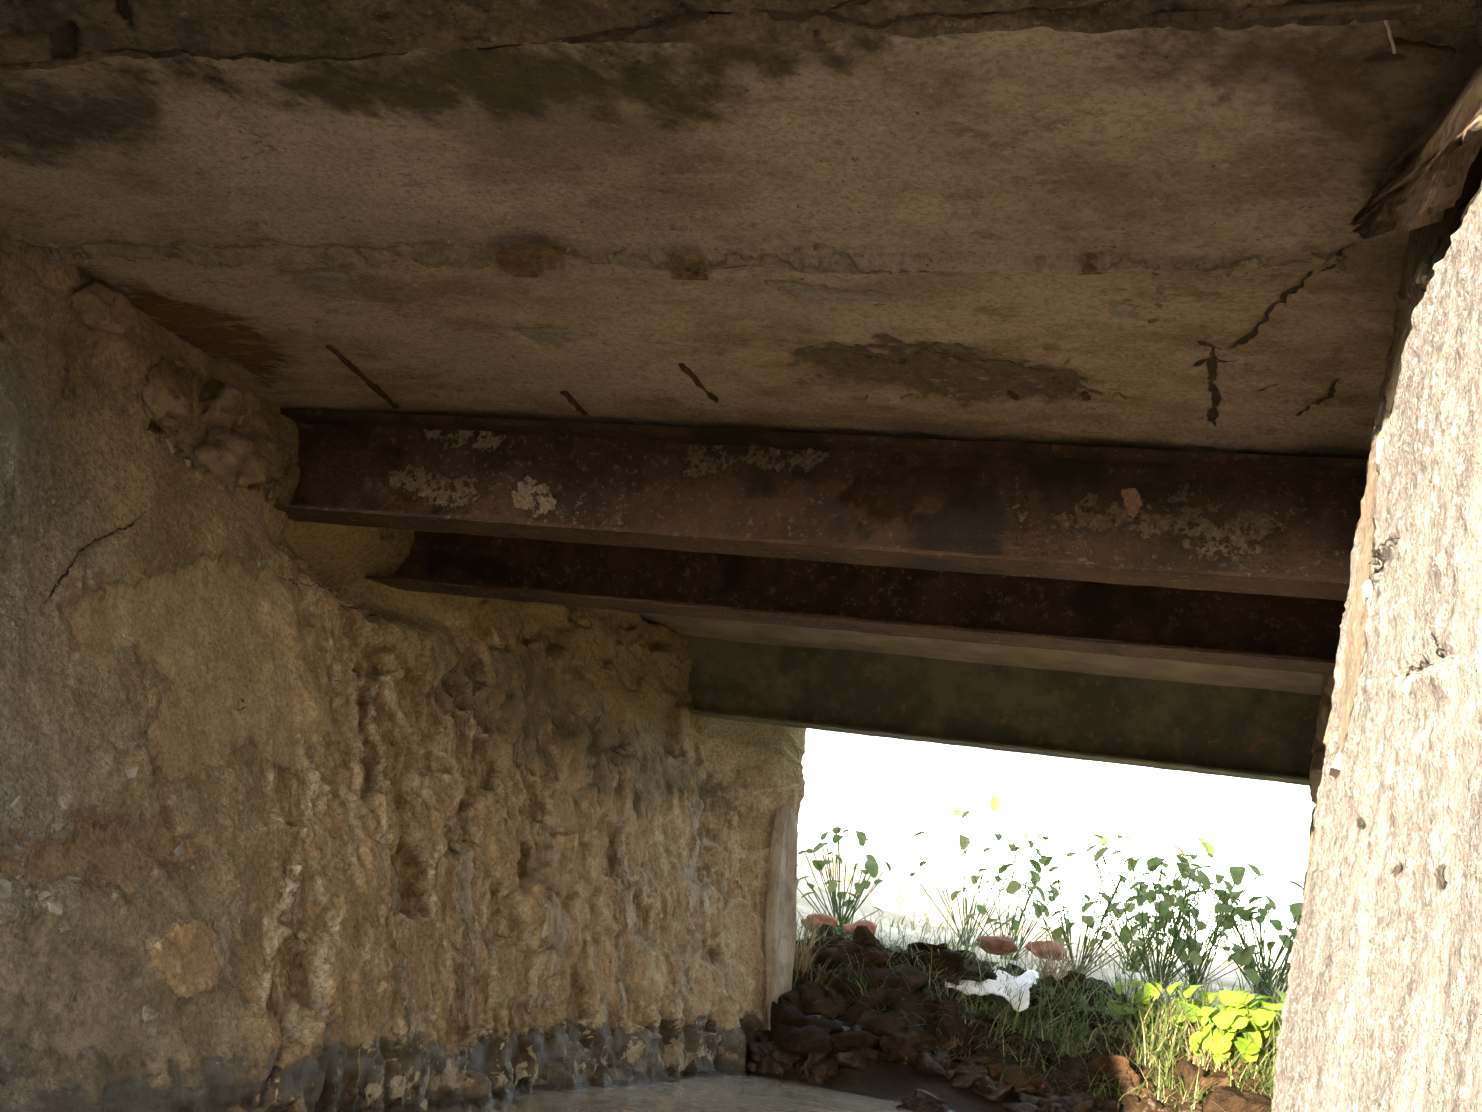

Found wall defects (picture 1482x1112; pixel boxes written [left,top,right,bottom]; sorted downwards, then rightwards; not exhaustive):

crack [0,49,408,68]
crack [463,0,1126,50]
damp [0,78,159,164]
spalling [773,330,1127,414]
crack [1193,242,1357,427]
damp [0,800,763,1112]